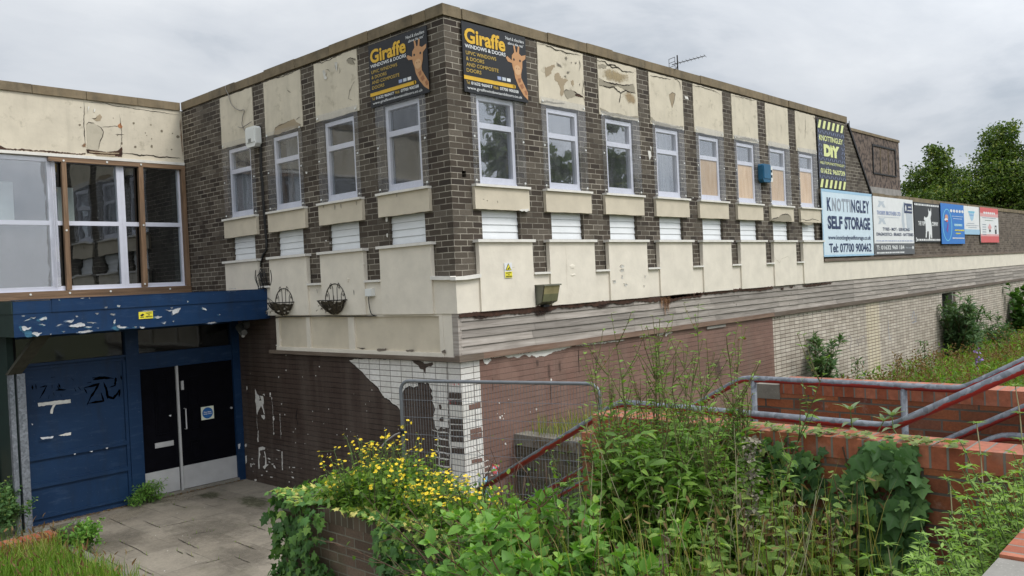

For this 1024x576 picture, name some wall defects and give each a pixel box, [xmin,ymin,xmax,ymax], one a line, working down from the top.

peeling [541,65,583,104]
crack [537,43,755,102]
crack [83,102,178,158]
peeling [19,301,189,336]
peeling [238,386,302,483]
peeling [349,347,457,474]